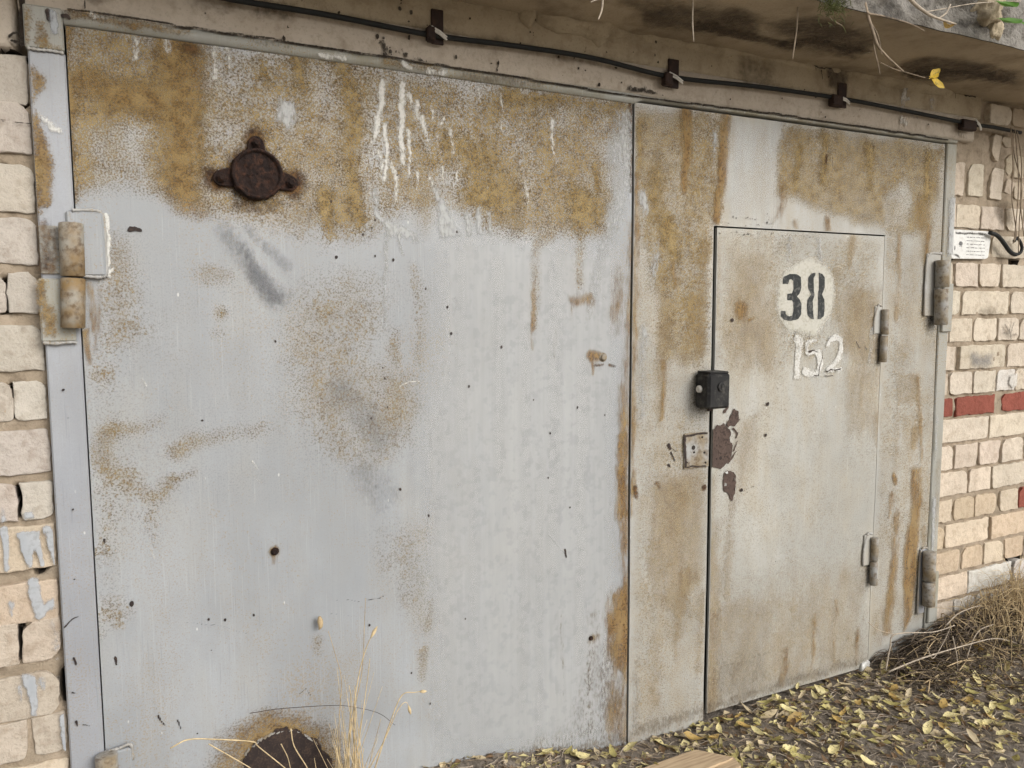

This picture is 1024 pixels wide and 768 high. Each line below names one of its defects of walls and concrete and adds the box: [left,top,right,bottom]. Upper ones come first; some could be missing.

leakage [644,9,872,58]
rust [24,9,731,738]
rust [725,123,944,639]
peeling [684,406,747,501]
rust [213,711,344,768]